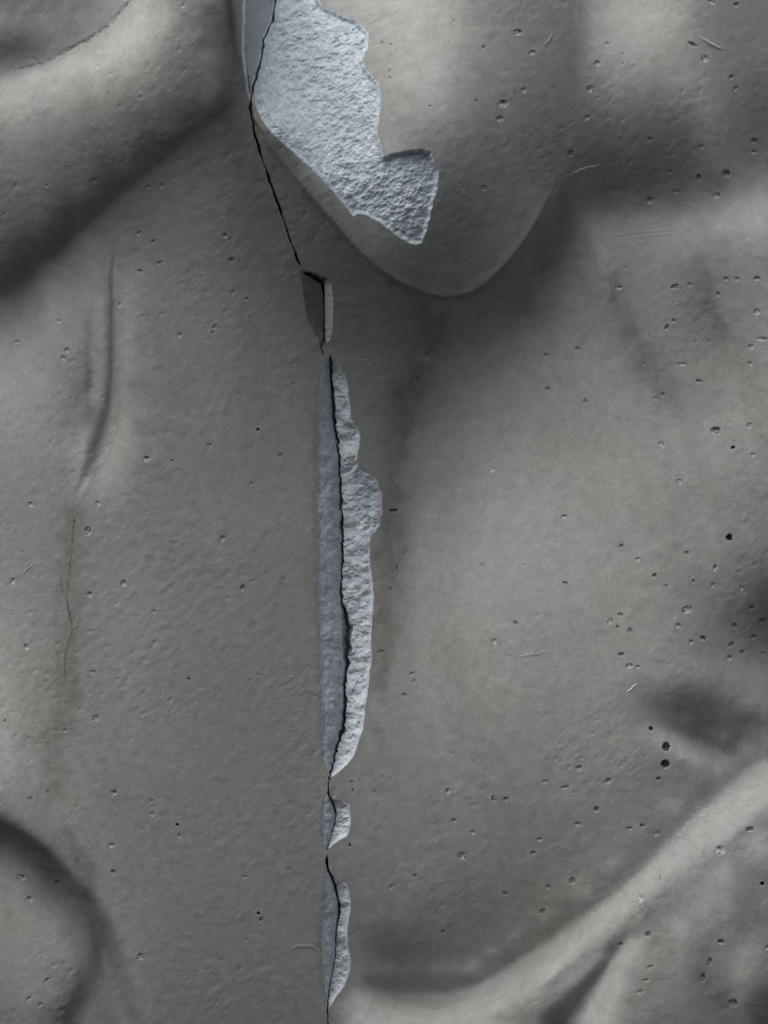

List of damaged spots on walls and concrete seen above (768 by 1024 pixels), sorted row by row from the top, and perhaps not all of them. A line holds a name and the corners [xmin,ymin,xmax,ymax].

spalling [241,0,439,246]
crack [248,0,353,1024]
spalling [300,269,397,849]
spalling [320,864,352,1010]